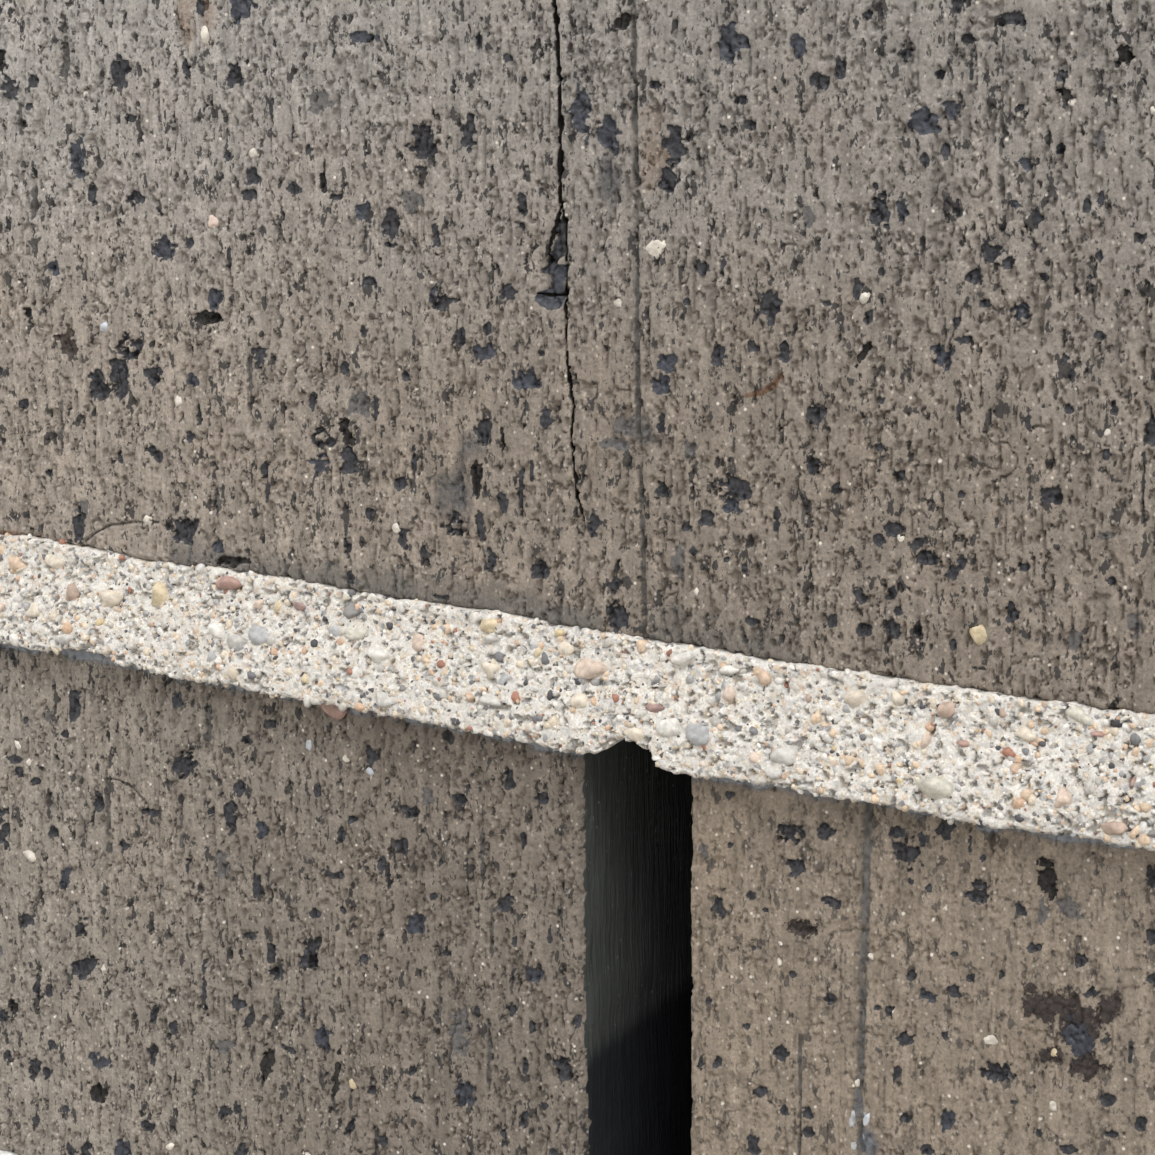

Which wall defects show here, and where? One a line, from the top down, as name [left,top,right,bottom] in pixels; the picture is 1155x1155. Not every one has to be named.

crack [537,0,587,528]